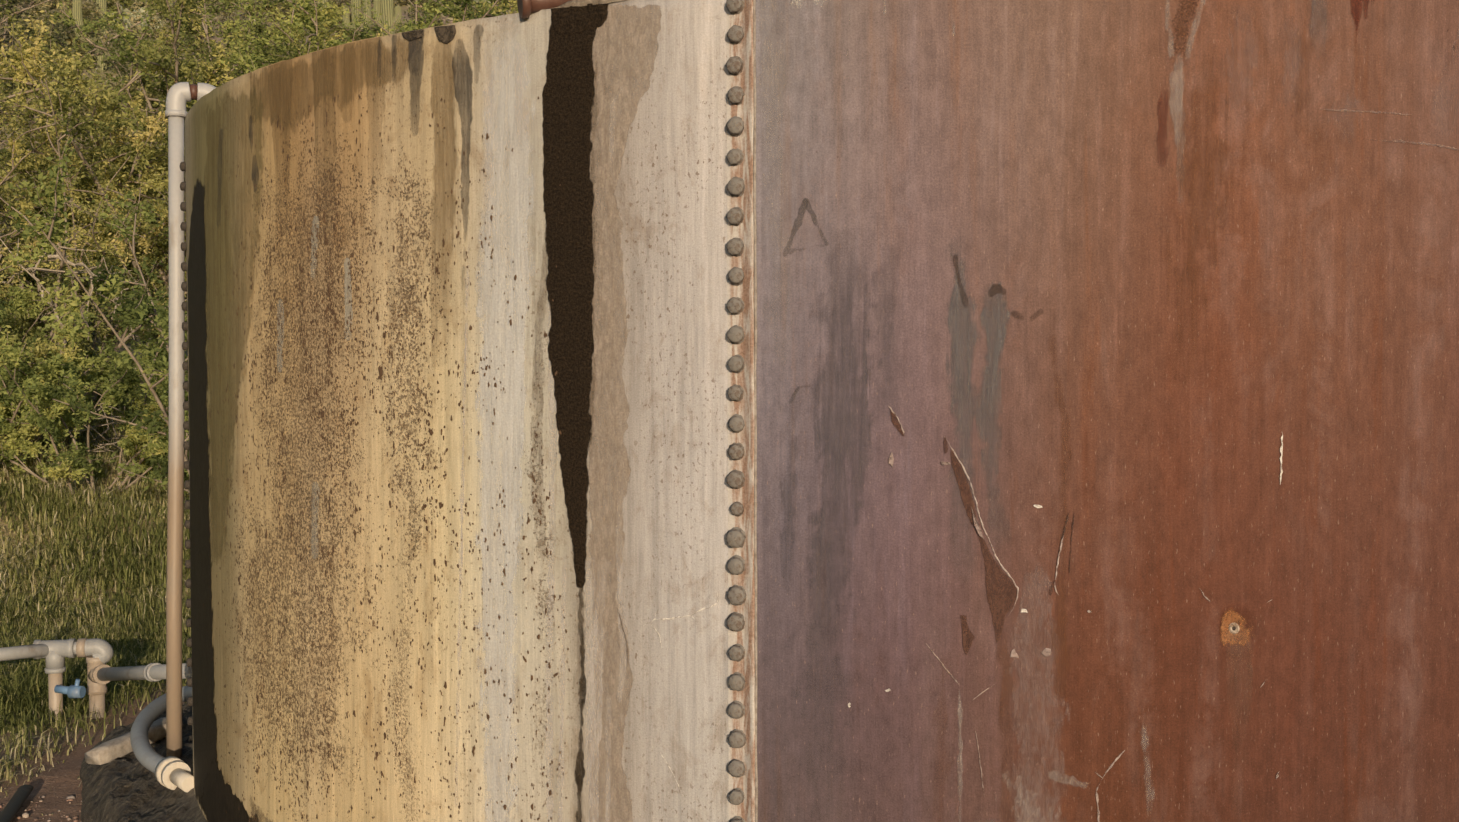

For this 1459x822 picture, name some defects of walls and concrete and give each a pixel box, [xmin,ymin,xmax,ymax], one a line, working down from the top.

water stain [379,28,424,90]
water stain [452,56,472,168]
rust [1171,0,1199,57]
rust [1351,0,1369,31]
water stain [187,179,259,822]
water stain [476,101,530,822]
water stain [551,0,661,822]
water stain [948,266,1009,437]
peeling [941,436,1028,658]